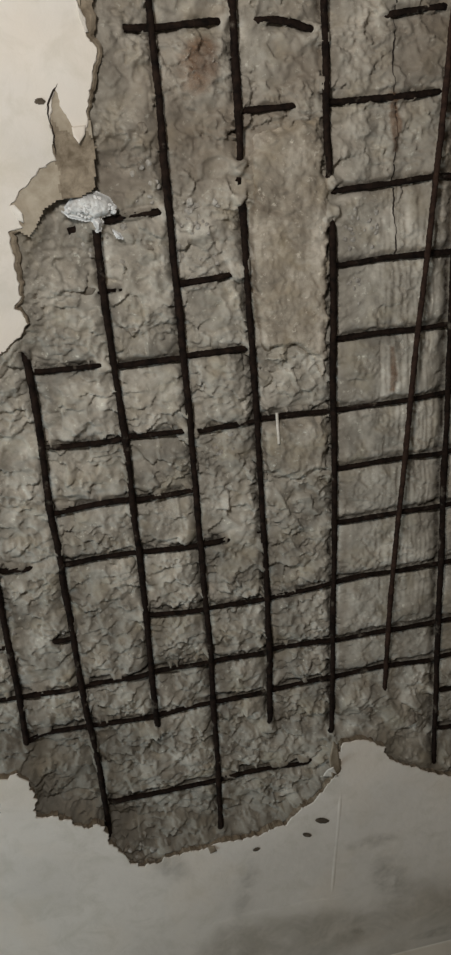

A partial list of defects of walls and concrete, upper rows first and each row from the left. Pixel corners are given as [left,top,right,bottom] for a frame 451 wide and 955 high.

spalling [10,0,267,829]
rust [185,38,215,87]
spalling [0,198,451,866]
spalling [152,0,451,764]